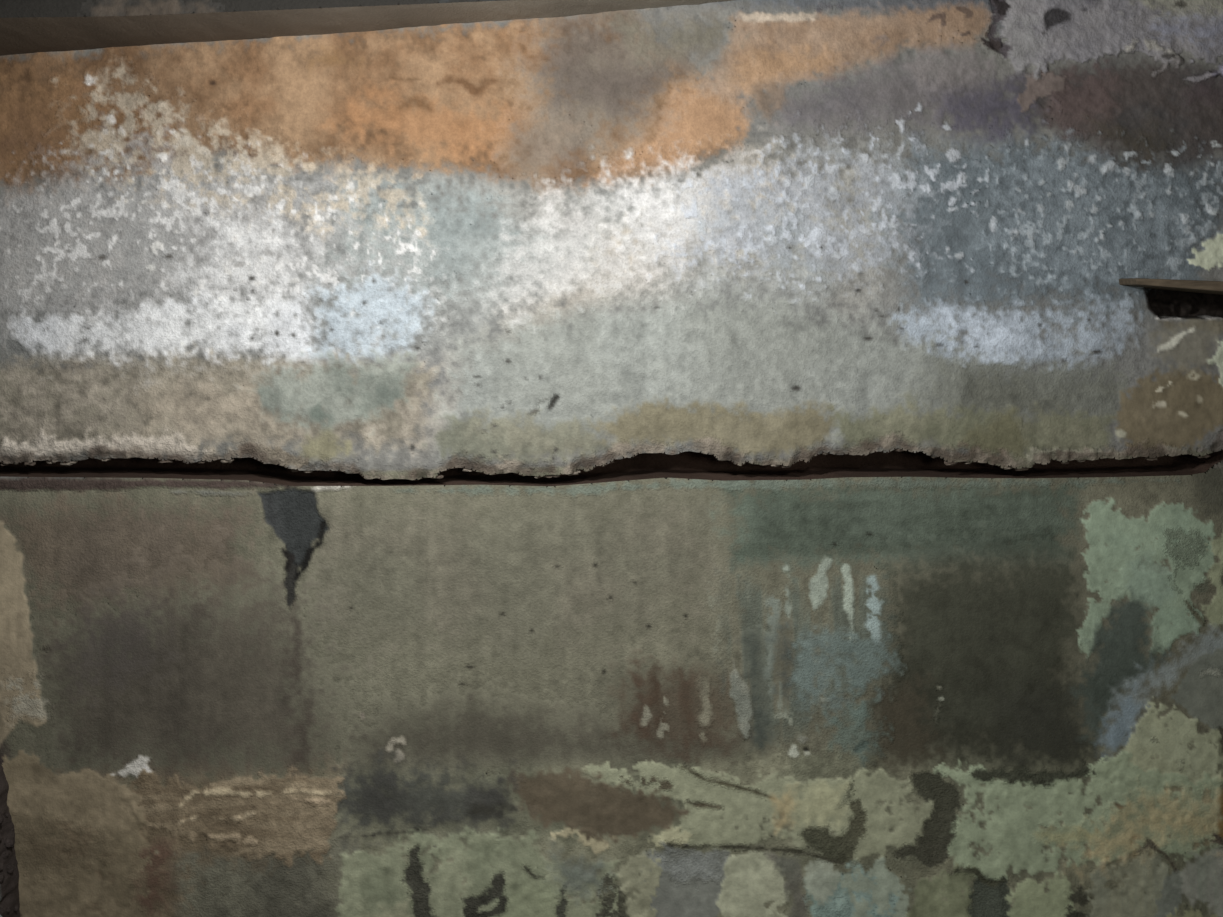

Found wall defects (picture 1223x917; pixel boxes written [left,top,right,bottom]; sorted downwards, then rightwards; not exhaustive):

corrosion [0,18,547,198]
corrosion [618,0,992,180]
water stain [0,0,1223,499]
peeling [1186,231,1223,272]
spalling [0,421,213,459]
spalling [271,329,298,340]
crack [0,429,1223,493]
peeling [1110,315,1223,476]
spalling [255,486,333,612]
peeling [0,520,1223,917]
water stain [694,520,1223,791]
peeling [1075,496,1223,654]